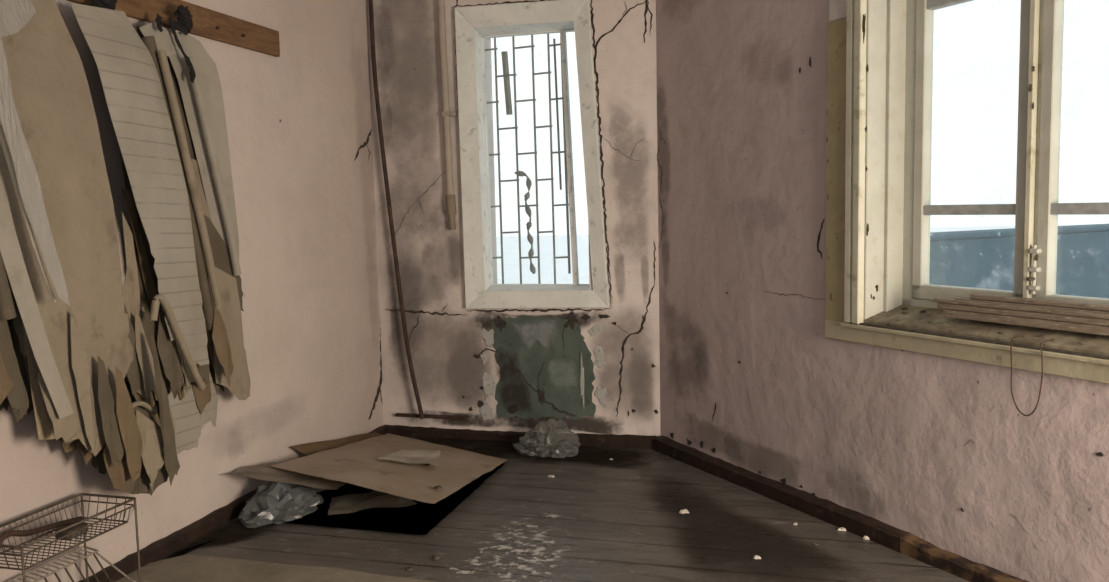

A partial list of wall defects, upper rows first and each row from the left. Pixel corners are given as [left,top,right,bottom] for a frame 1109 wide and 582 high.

crack [593,0,653,106]
crack [369,123,667,420]
flaking render [462,311,616,421]
damp [531,313,591,327]